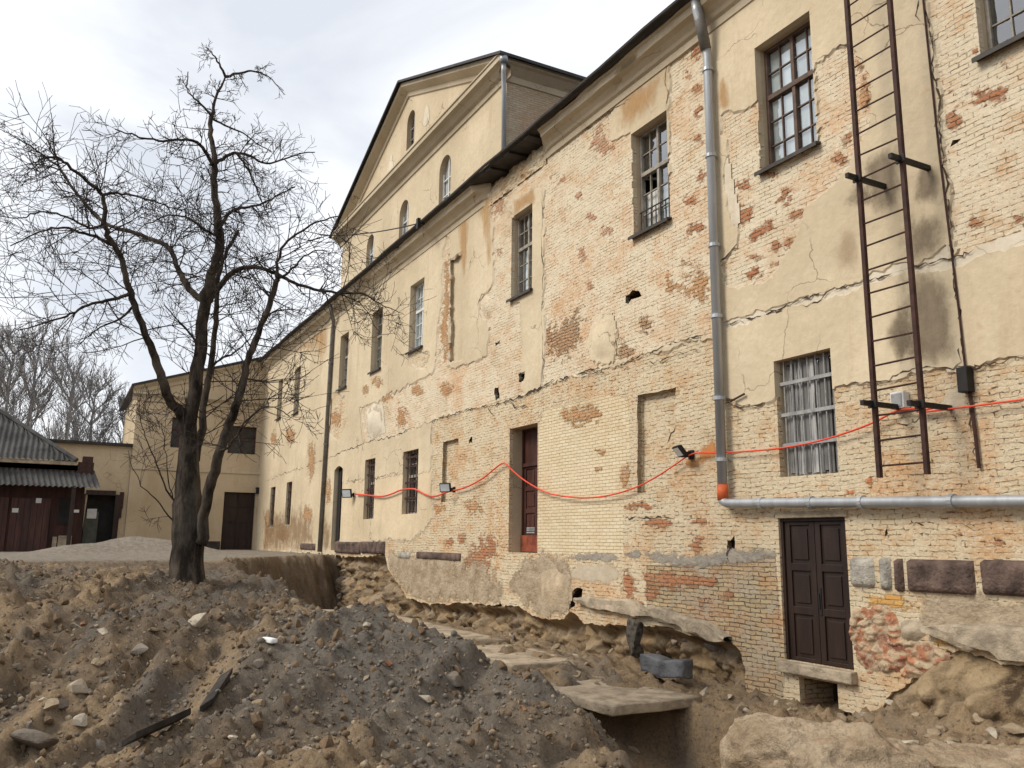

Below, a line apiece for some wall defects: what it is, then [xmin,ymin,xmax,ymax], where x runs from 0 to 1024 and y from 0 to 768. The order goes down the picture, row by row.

peeling [928,0,1024,257]
crack [726,0,1015,386]
leakage [855,154,896,206]
leakage [918,171,934,197]
leakage [912,221,937,255]
crack [272,216,702,480]
peeling [325,44,1024,725]
leakage [890,277,947,361]
spalling [306,442,316,483]